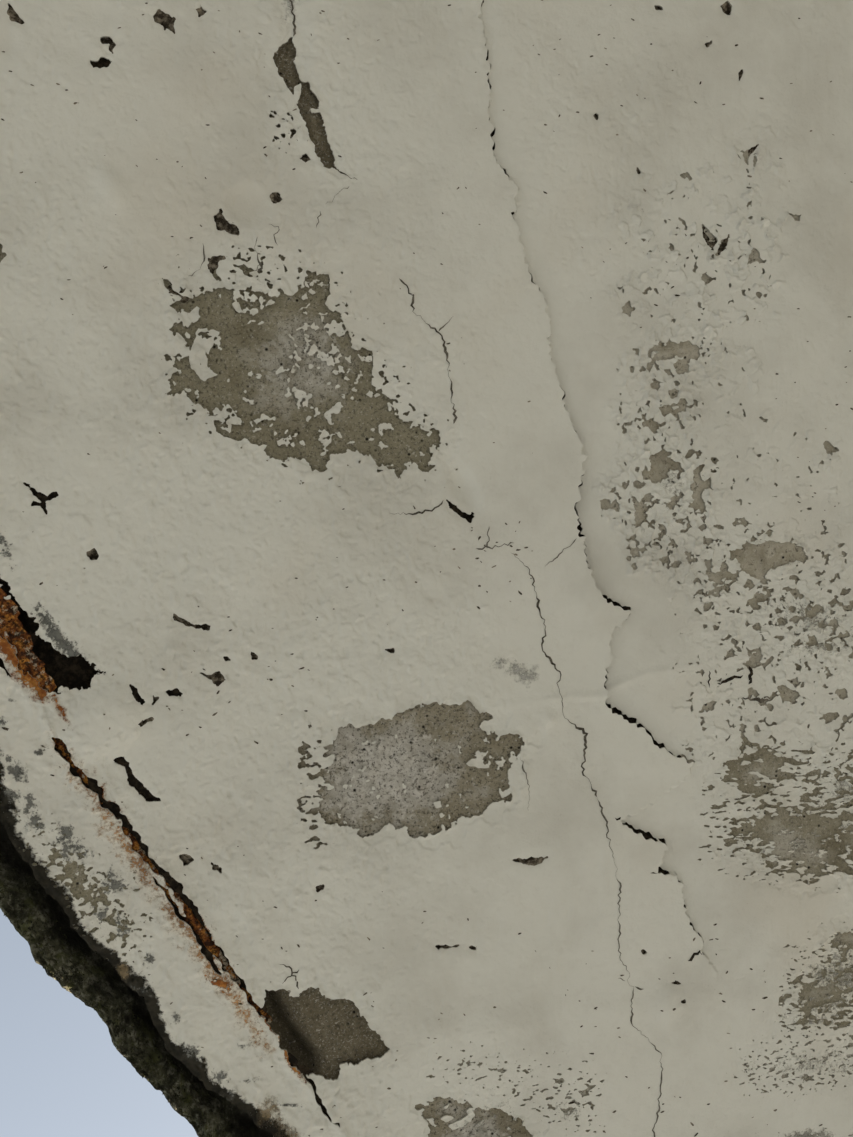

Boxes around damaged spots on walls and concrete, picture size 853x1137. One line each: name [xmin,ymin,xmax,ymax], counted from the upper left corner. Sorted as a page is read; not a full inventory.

spalling [269,38,339,171]
spalling [161,209,449,487]
crack [0,658,11,677]
rust [0,633,68,721]
peeling [600,337,853,885]
rust [68,772,166,890]
crack [53,740,267,1016]
spalling [297,700,524,849]
crack [476,475,704,1137]
rust [161,901,307,1083]
crack [288,1053,340,1127]
spalling [264,987,389,1080]